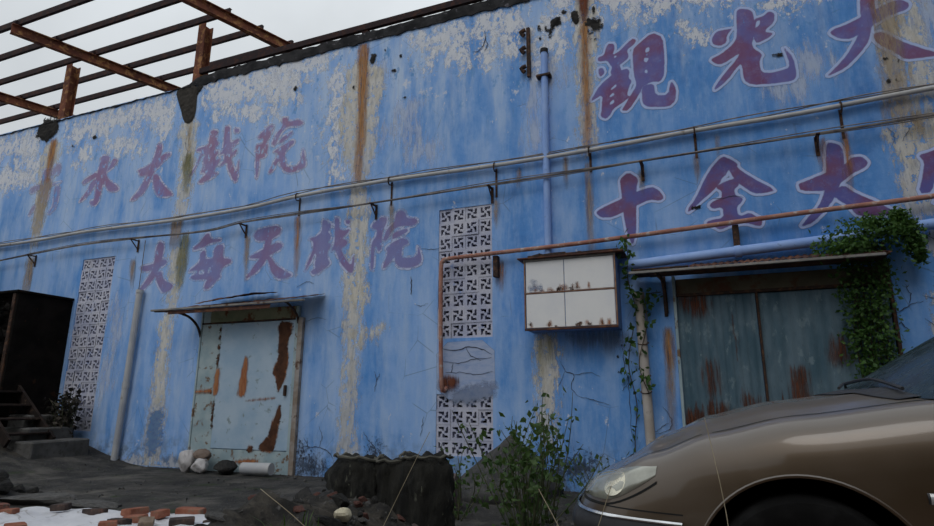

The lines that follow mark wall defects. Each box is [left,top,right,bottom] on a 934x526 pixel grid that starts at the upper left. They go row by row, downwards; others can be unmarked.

rust [23,138,63,285]
peeling [0,50,357,198]
damp [173,118,199,218]
rust [336,44,386,455]
spalling [370,49,396,87]
peeling [399,0,746,148]
rust [566,0,601,226]
peeling [757,0,822,17]
rust [874,0,934,122]
damp [881,109,934,220]
crack [443,346,492,375]
damp [531,334,604,489]